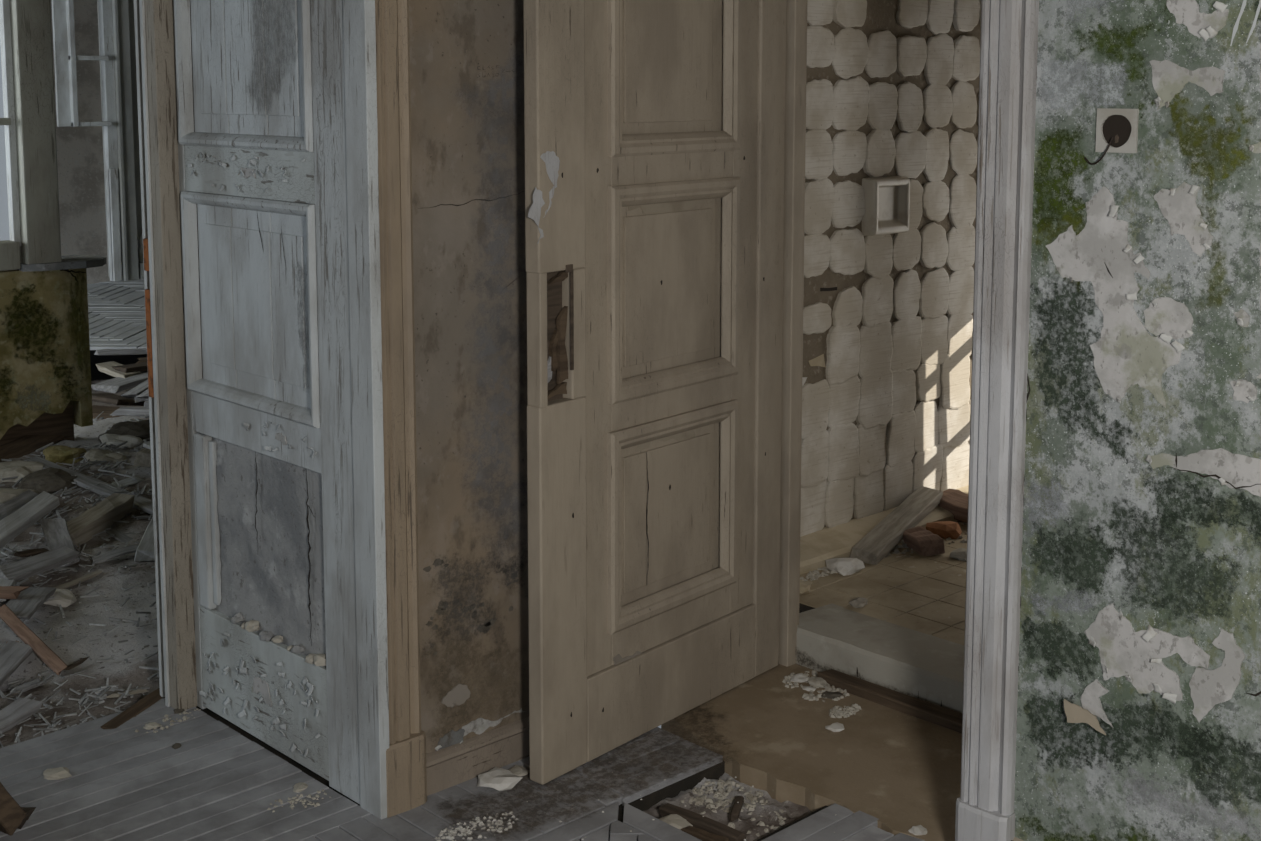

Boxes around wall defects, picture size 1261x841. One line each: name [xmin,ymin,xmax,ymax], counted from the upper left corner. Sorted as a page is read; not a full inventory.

water stain [1039,0,1171,119]
peeling [1167,0,1229,41]
water stain [1033,126,1094,258]
peeling [1153,182,1214,257]
water stain [1169,91,1252,305]
peeling [1046,186,1193,408]
water stain [1030,277,1138,464]
peeling [441,683,471,708]
water stain [423,551,528,737]
flaking render [435,708,527,751]
water stain [1019,467,1261,841]
peeling [1064,603,1245,735]